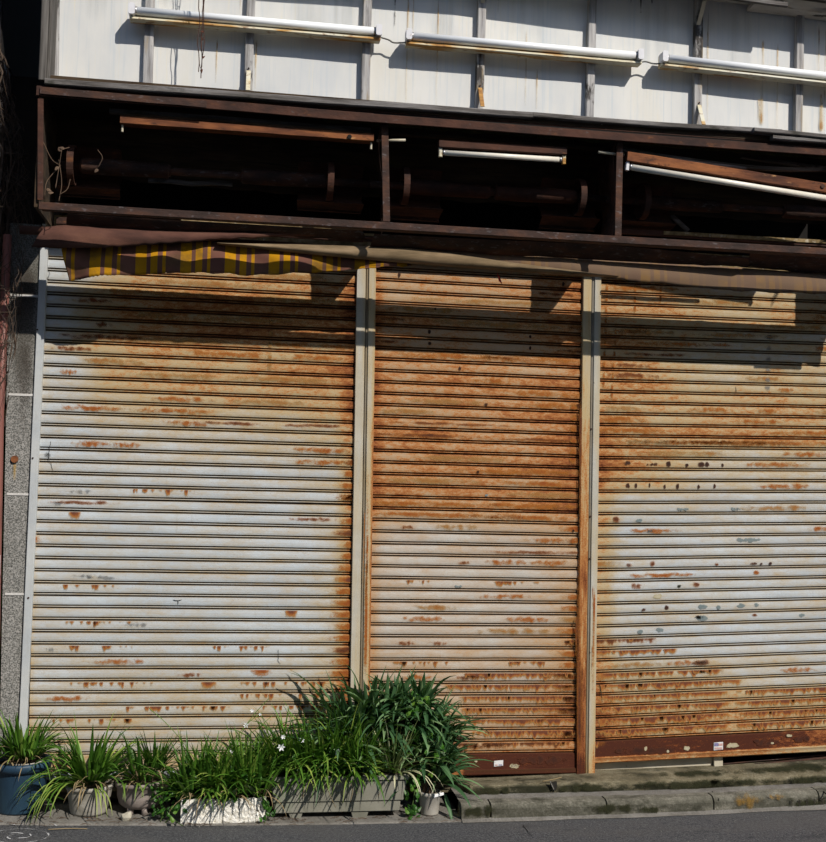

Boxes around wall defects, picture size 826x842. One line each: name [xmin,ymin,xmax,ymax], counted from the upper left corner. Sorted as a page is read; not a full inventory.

rust [139,279,252,296]
rust [458,292,581,306]
rust [195,296,348,383]
rust [375,340,581,363]
rust [141,372,212,380]
rust [600,284,826,467]
rust [143,396,253,426]
rust [295,447,354,500]
rust [56,500,107,518]
rust [363,390,582,670]
rust [627,562,699,589]
rust [240,518,352,713]